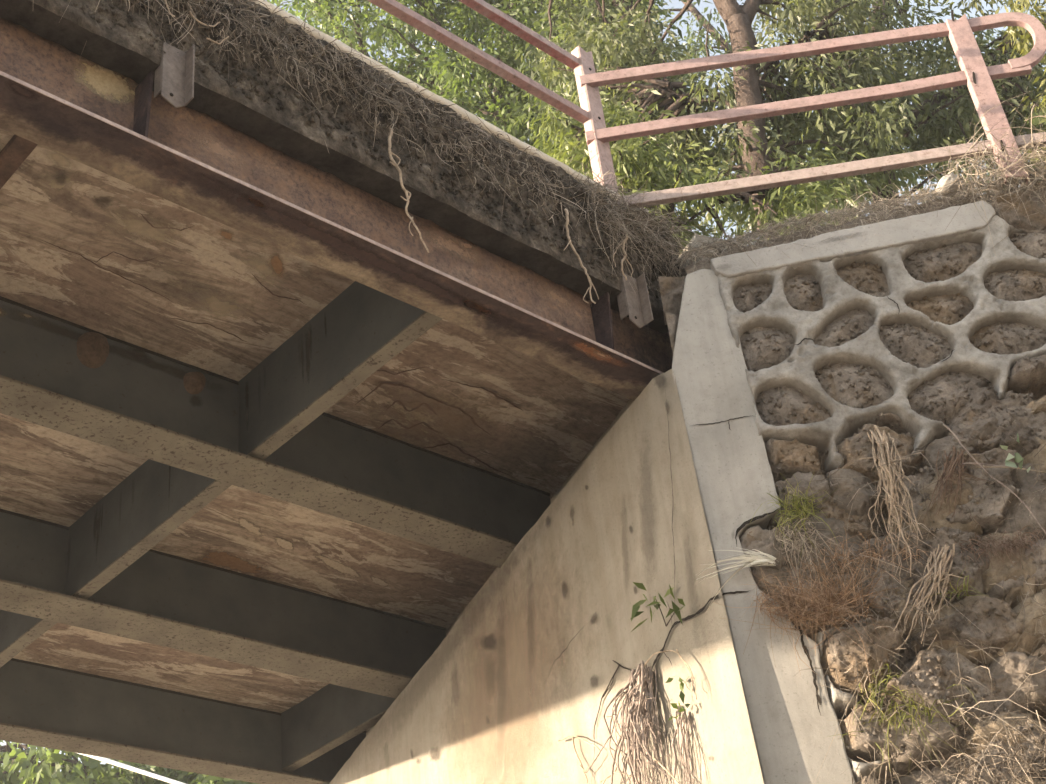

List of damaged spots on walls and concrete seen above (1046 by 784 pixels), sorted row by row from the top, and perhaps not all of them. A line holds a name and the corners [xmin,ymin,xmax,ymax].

crack [652,391,749,668]
crack [792,601,822,715]